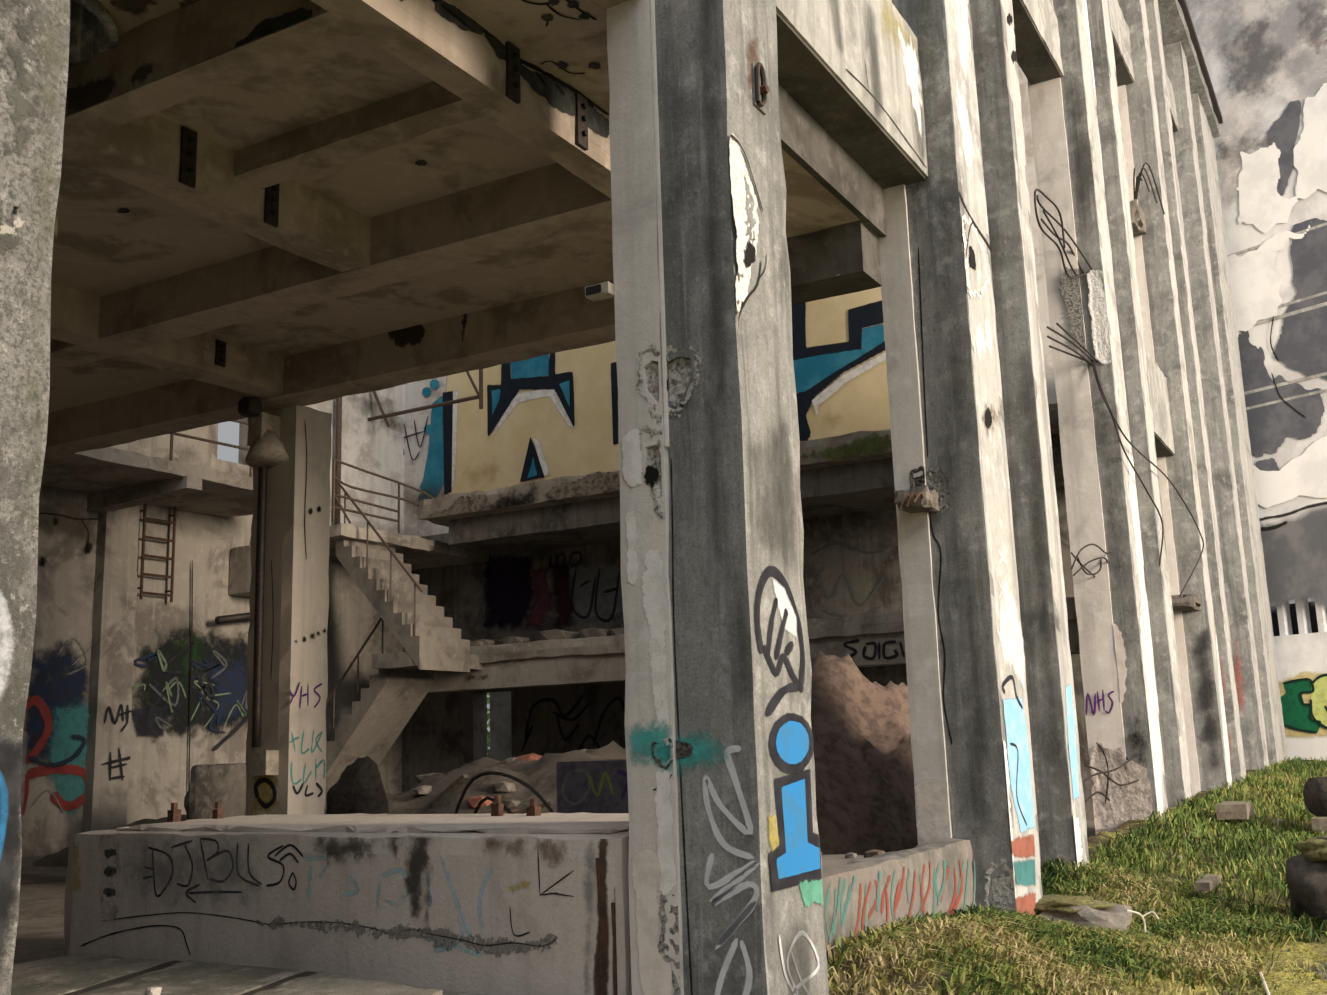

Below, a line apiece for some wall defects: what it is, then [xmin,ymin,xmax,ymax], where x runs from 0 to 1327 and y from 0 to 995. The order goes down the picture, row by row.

peeling [435,0,609,138]
peeling [0,217,26,235]
spalling [547,343,702,519]
spalling [1034,189,1204,597]
spalling [429,494,486,518]
peeling [1113,624,1127,703]
damp [318,837,371,860]
damp [391,837,429,916]
corrosion [594,839,618,995]
peeling [625,509,694,995]
spalling [1073,743,1155,868]